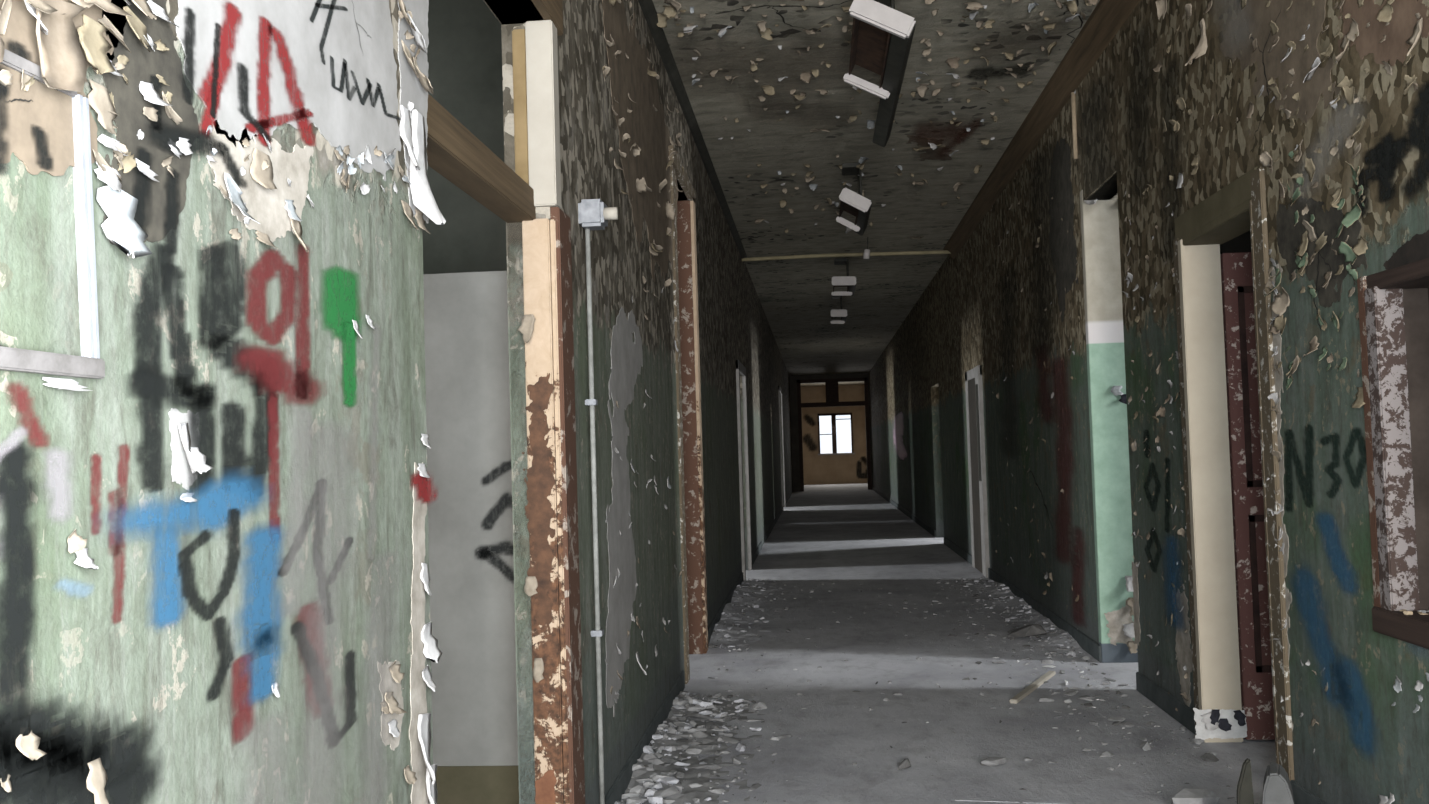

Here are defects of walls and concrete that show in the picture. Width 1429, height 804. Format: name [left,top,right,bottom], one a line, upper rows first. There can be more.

peeling [0,0,446,258]
peeling [657,0,853,121]
peeling [892,0,1098,186]
peeling [1022,138,1097,334]
peeling [602,0,684,717]
peeling [1111,350,1181,468]
peeling [1153,0,1429,692]
peeling [0,774,12,792]
peeling [16,727,47,760]
peeling [86,758,109,804]
peeling [1104,556,1247,740]
peeling [1391,673,1429,713]